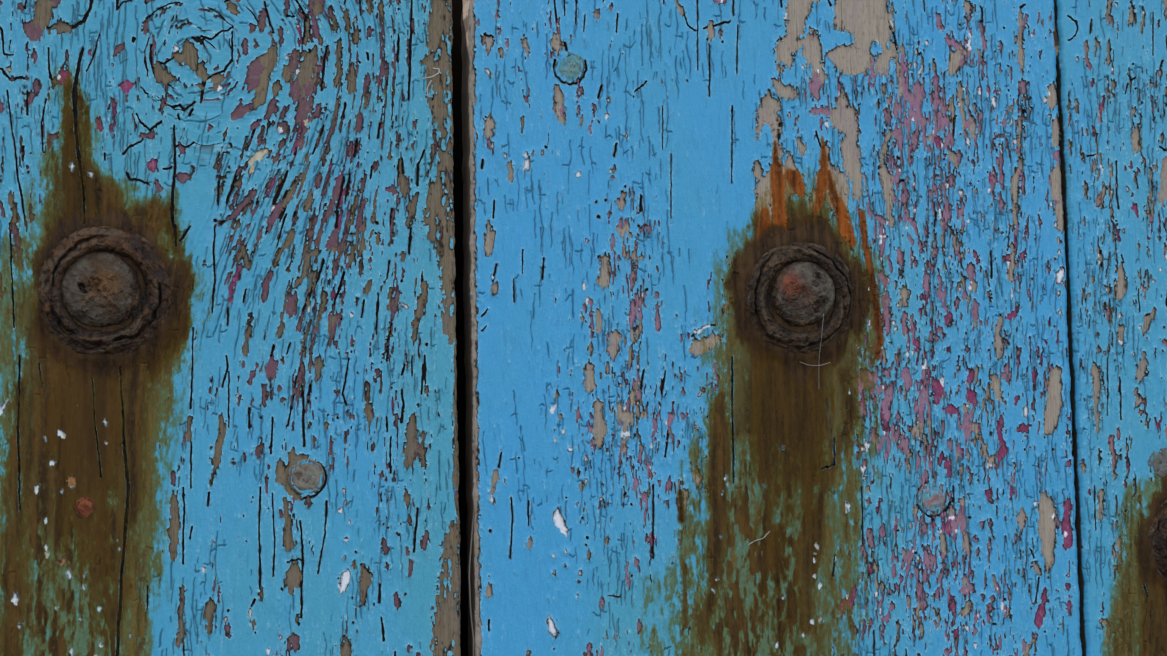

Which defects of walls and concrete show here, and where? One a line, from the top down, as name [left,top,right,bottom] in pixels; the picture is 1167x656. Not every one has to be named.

peeling [0,0,84,268]
rust [0,116,191,656]
crack [91,366,149,656]
crack [182,441,210,564]
crack [0,0,434,511]
peeling [95,0,571,656]
crack [383,507,418,552]
peeling [552,79,610,134]
peeling [707,20,723,42]
rust [679,138,883,656]
peeling [751,0,1167,656]
rust [1112,479,1167,656]